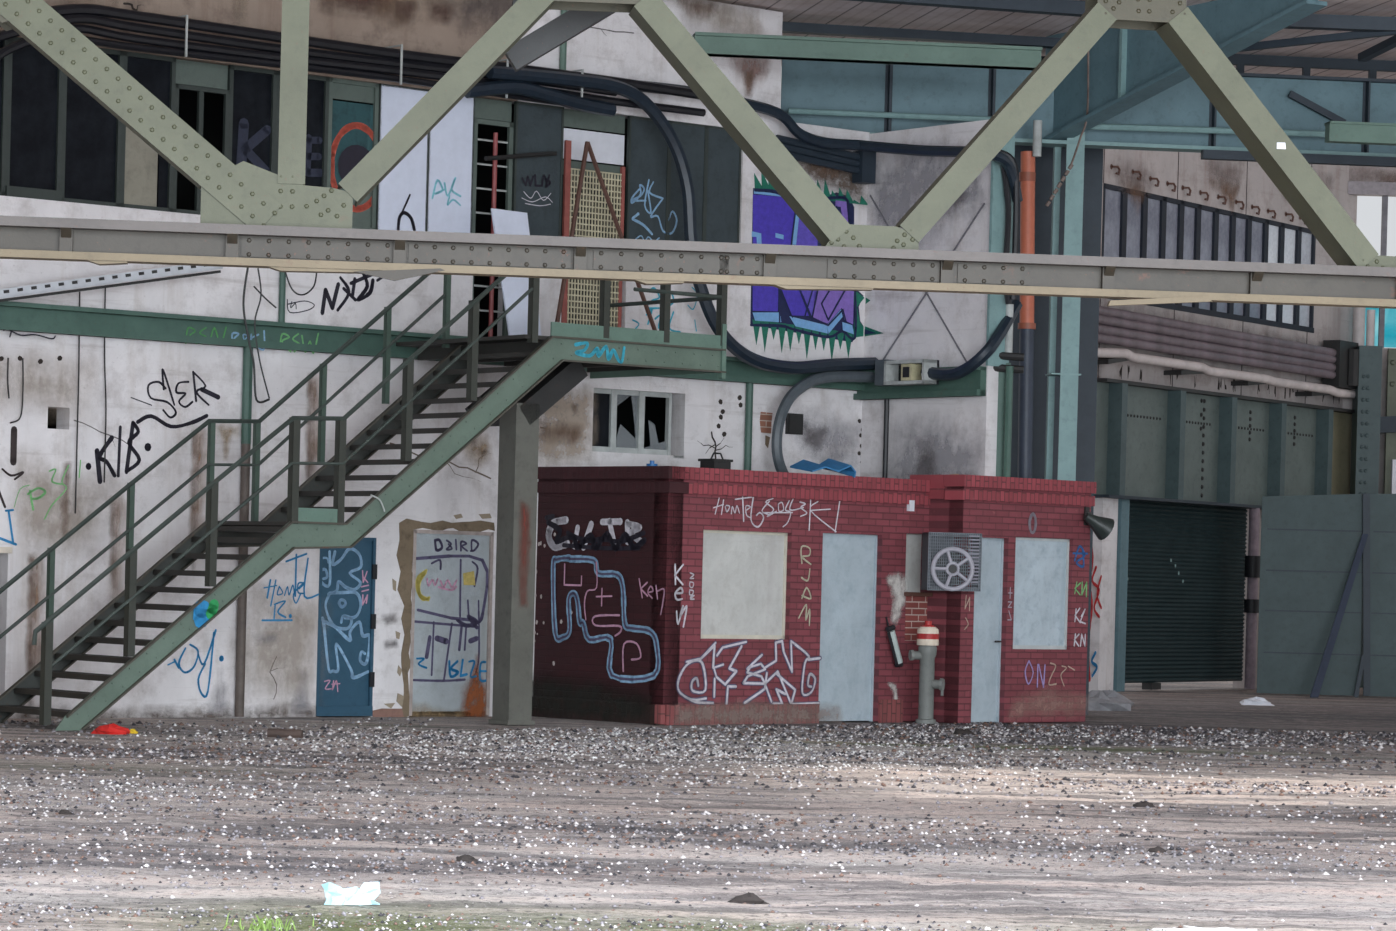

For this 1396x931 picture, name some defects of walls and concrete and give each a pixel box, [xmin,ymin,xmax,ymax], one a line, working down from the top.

damp [897,434,970,479]
spalling [372,514,495,717]